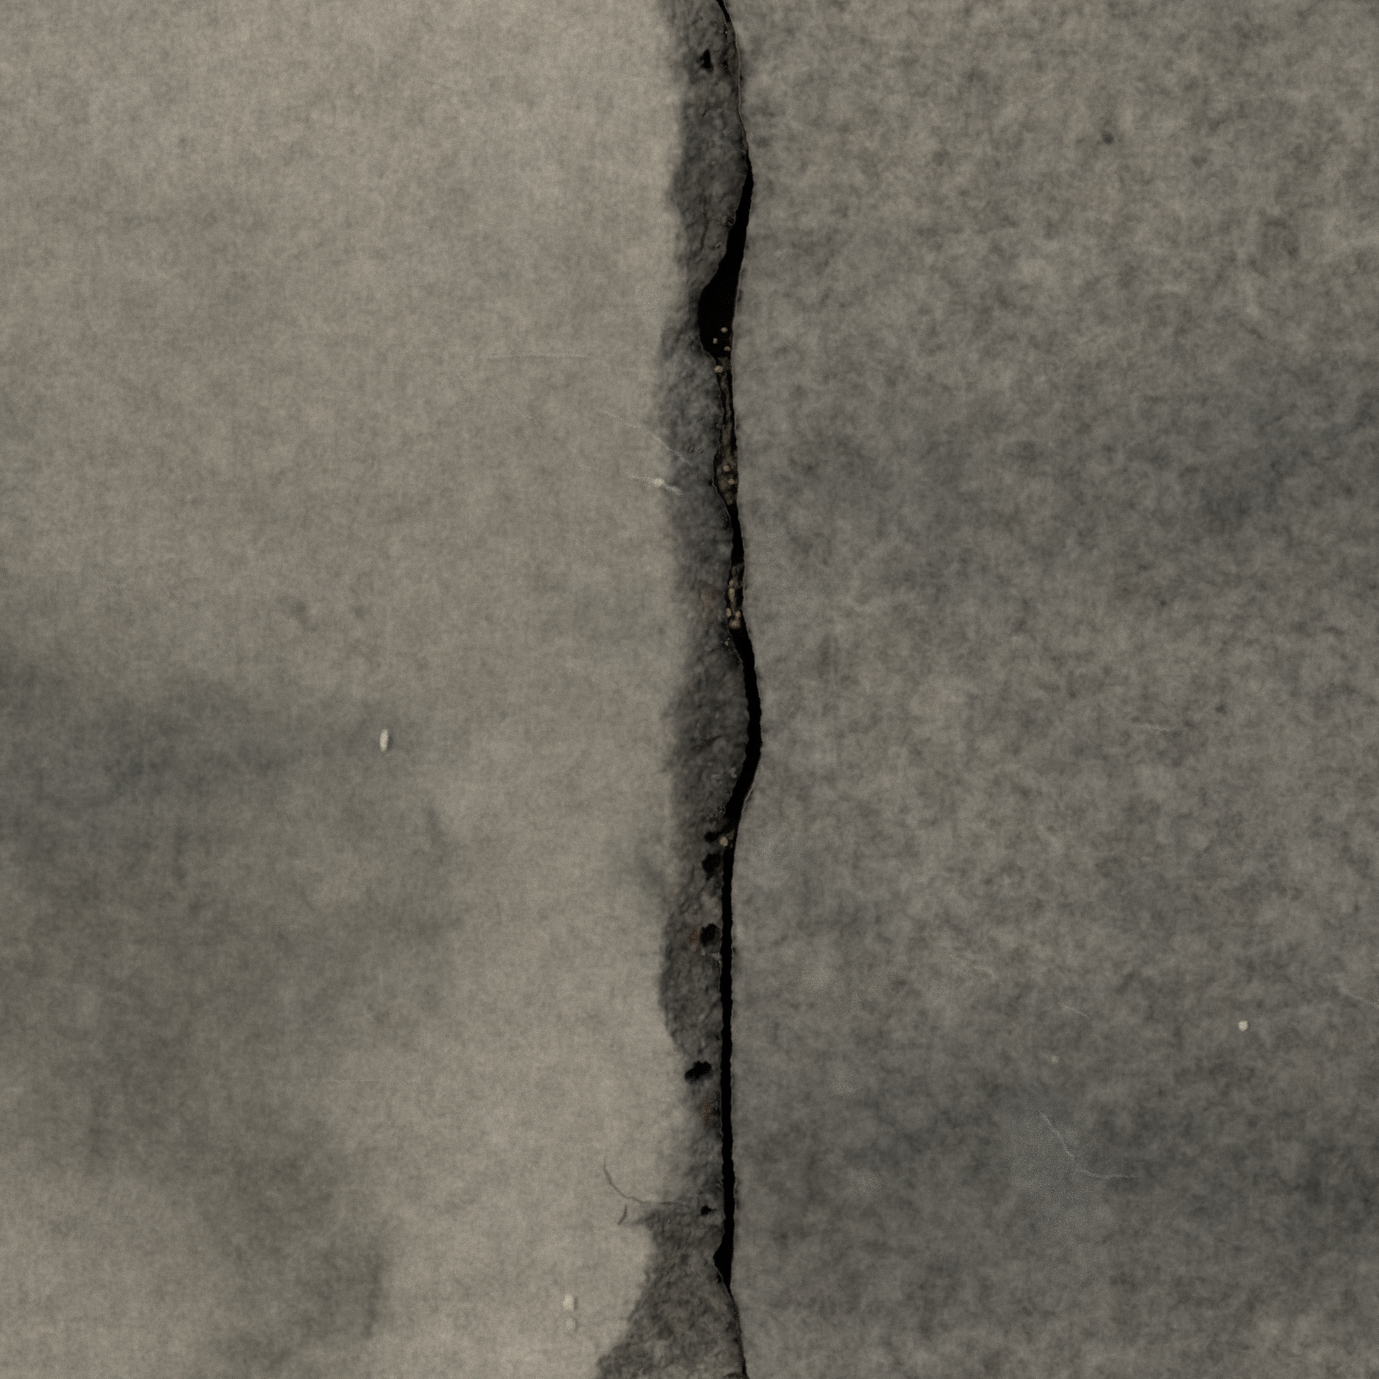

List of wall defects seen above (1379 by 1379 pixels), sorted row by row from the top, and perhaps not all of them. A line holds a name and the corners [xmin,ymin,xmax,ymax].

spalling [580,0,750,1379]
crack [692,0,763,1379]